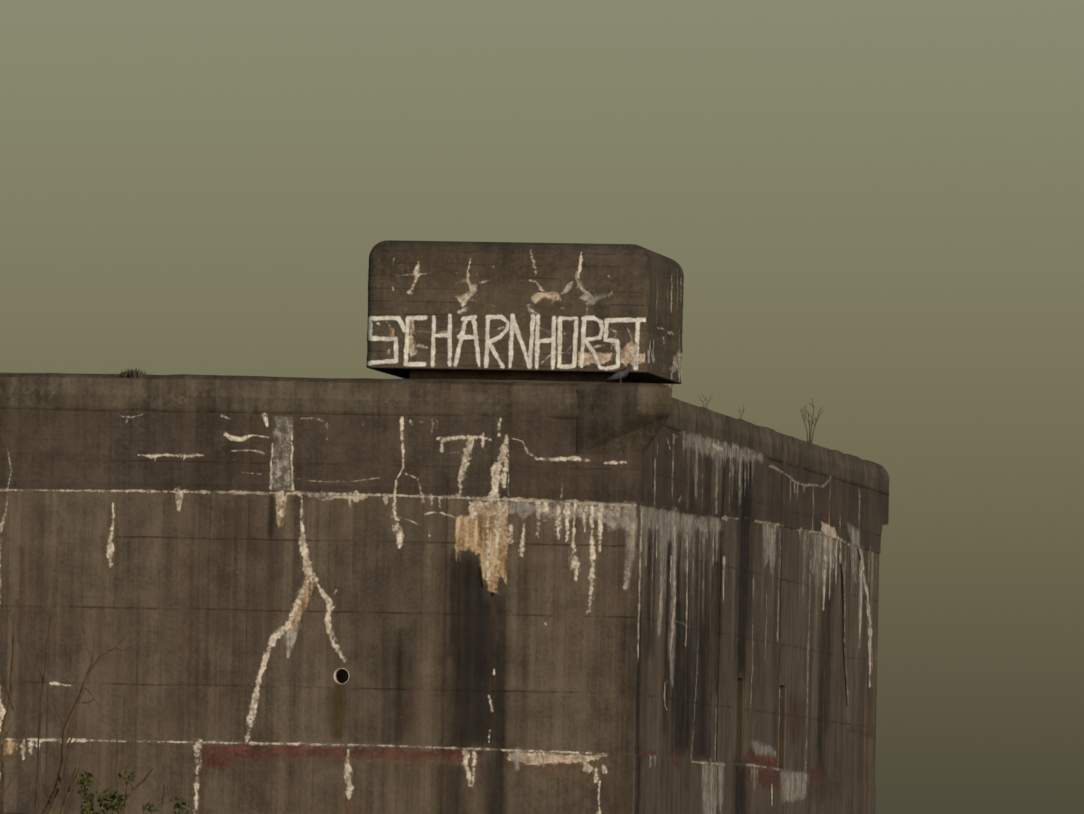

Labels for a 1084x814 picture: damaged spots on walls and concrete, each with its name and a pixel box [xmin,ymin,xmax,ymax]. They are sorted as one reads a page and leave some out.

crack [245,416,627,742]
peeling [455,501,510,597]
water stain [450,560,607,814]
water stain [507,434,781,814]
water stain [781,740,807,803]
water stain [798,492,873,714]
crack [840,546,872,705]